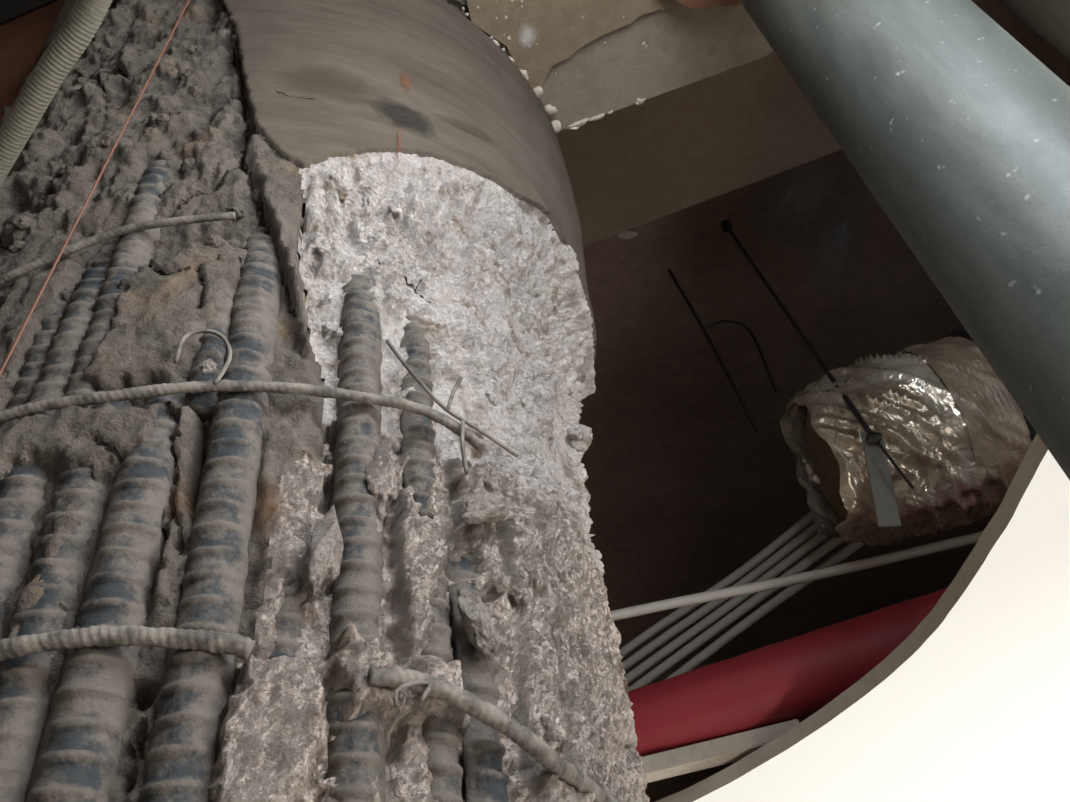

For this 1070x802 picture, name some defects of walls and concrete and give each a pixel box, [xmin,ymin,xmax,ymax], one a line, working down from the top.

peeling [467,0,684,133]
crack [95,435,123,462]
crack [162,434,194,555]
spalling [0,0,650,802]